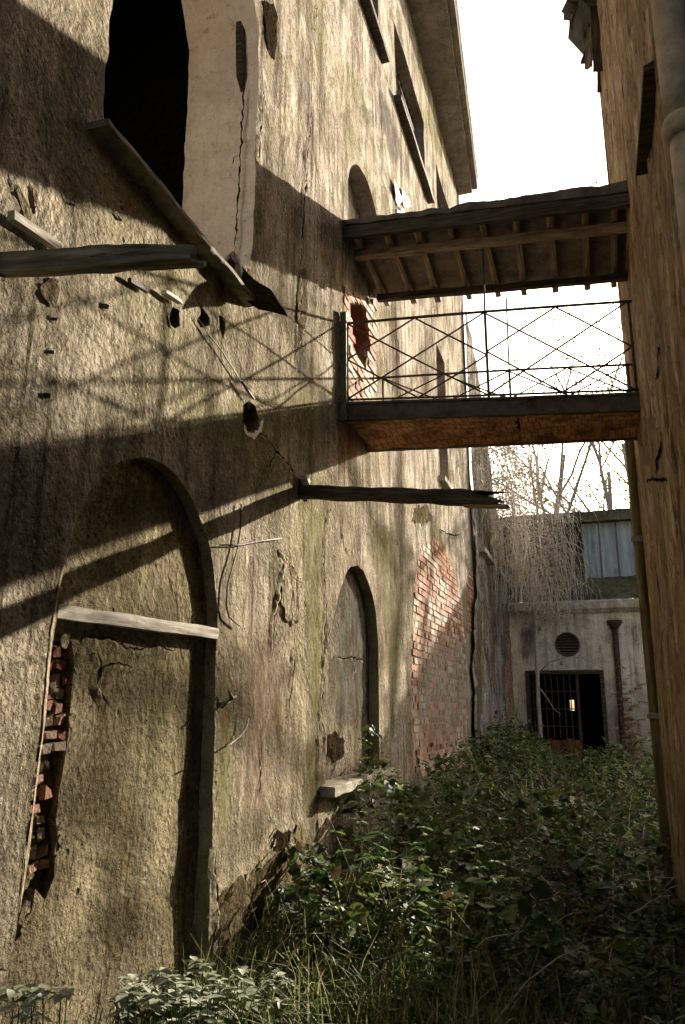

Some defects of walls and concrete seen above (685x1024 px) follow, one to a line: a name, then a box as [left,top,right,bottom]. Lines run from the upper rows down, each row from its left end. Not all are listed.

crack [232,69,265,252]
spalling [167,297,227,346]
spalling [242,401,263,439]
flaking render [343,287,377,402]
flaking render [17,526,81,933]
crack [81,634,179,716]
crack [268,502,366,784]
flaking render [326,727,345,766]
flaking render [409,503,514,782]
flaking render [207,813,309,988]